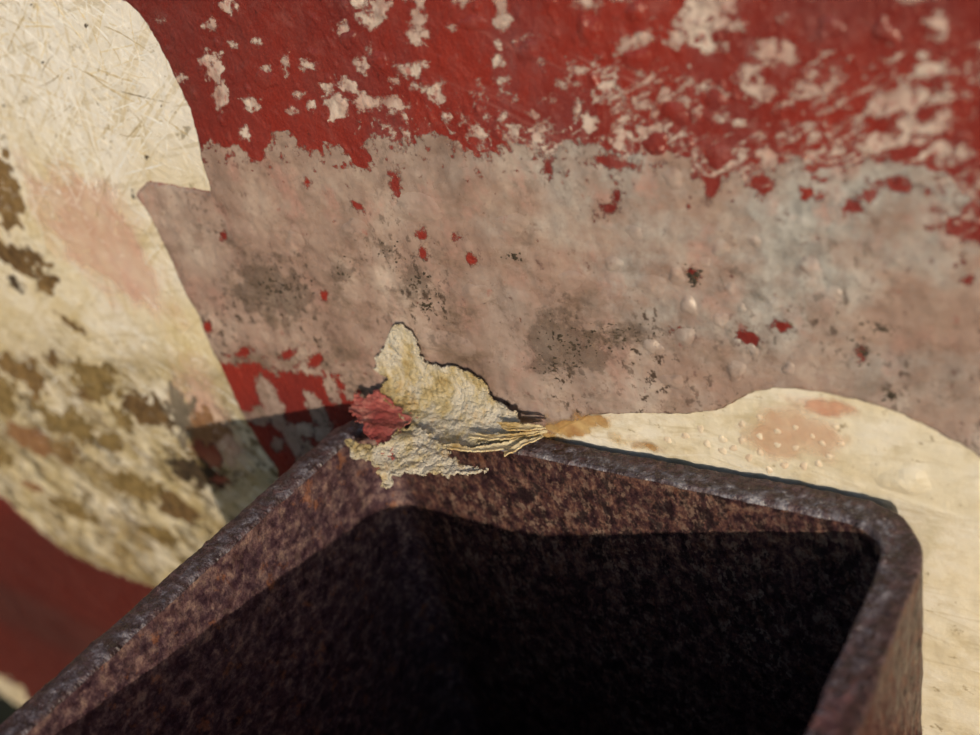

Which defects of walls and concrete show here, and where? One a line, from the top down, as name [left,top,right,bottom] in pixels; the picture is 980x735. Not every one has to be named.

peeling [218,0,239,16]
peeling [337,0,393,35]
peeling [405,0,430,47]
peeling [492,0,513,29]
peeling [613,0,745,56]
peeling [198,41,261,113]
peeling [306,60,446,123]
peeling [569,98,599,134]
peeling [574,62,663,118]
peeling [733,38,796,107]
peeling [826,75,956,158]
peeling [907,51,952,81]